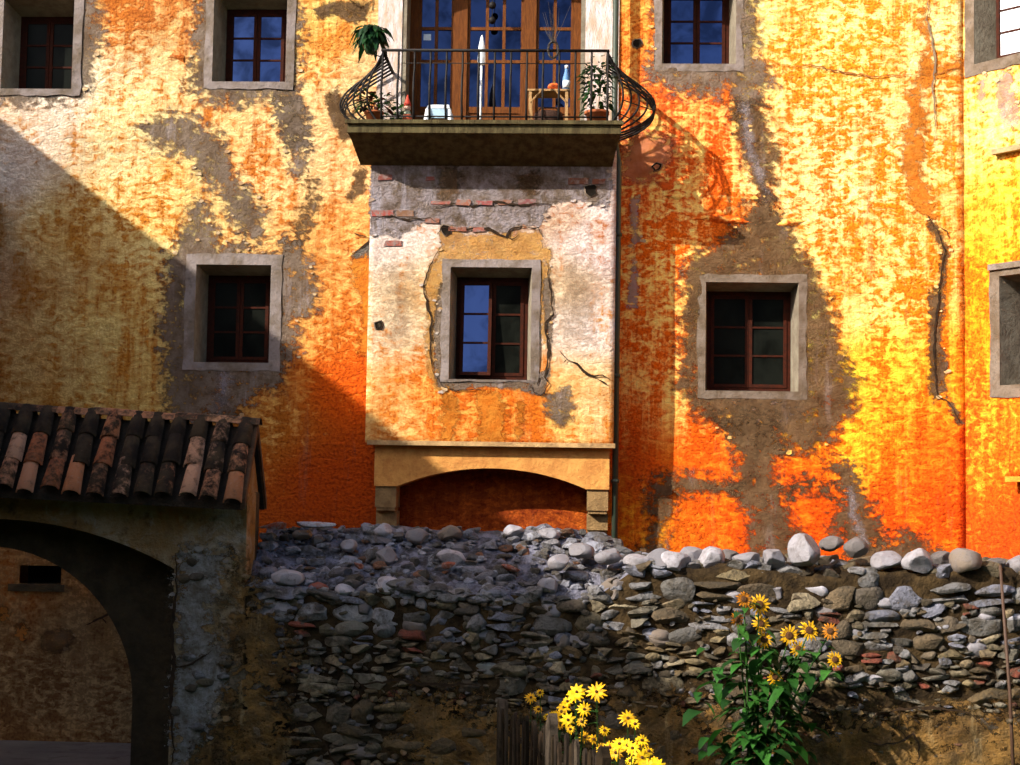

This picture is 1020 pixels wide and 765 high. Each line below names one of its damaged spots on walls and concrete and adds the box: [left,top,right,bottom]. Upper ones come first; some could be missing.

crack [771,2,962,142]
crack [352,200,552,392]
flaking render [351,165,616,394]
crack [531,264,609,396]
flaking render [626,261,639,308]
flaking render [628,194,646,248]
crack [928,216,960,422]
flaking render [163,541,314,765]